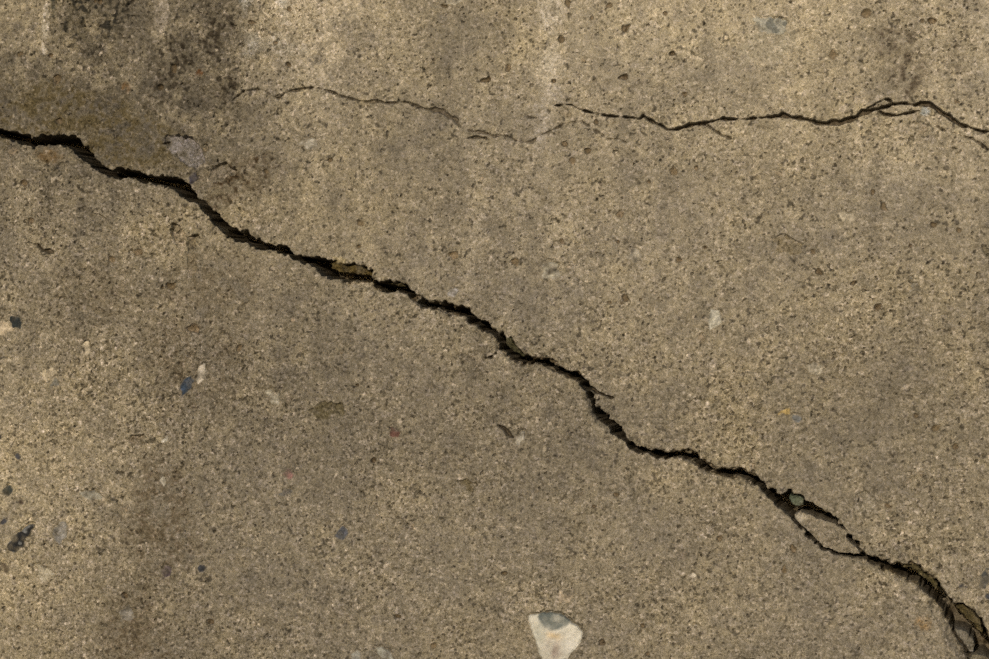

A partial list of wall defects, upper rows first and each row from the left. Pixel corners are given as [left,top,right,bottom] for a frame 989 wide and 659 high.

crack [233,86,989,150]
crack [0,127,989,652]
crack [952,626,972,657]
crack [967,646,989,659]